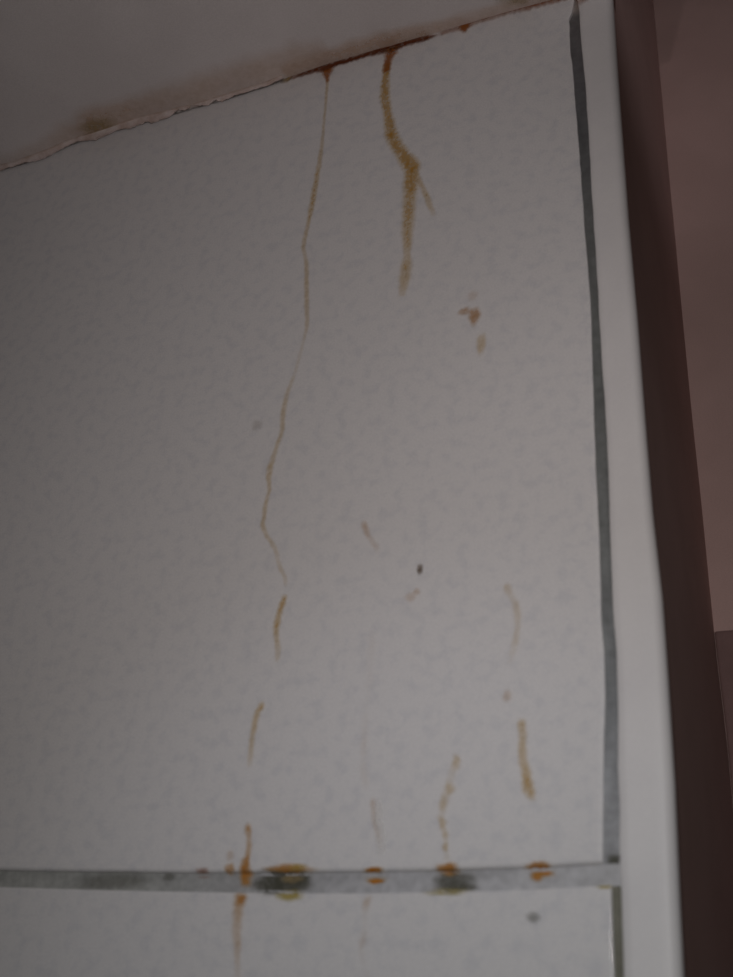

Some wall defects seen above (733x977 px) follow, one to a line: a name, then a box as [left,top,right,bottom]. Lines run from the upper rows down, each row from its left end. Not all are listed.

rust [381,48,419,243]
rust [227,855,251,905]
rust [366,867,383,884]
rust [529,862,551,880]